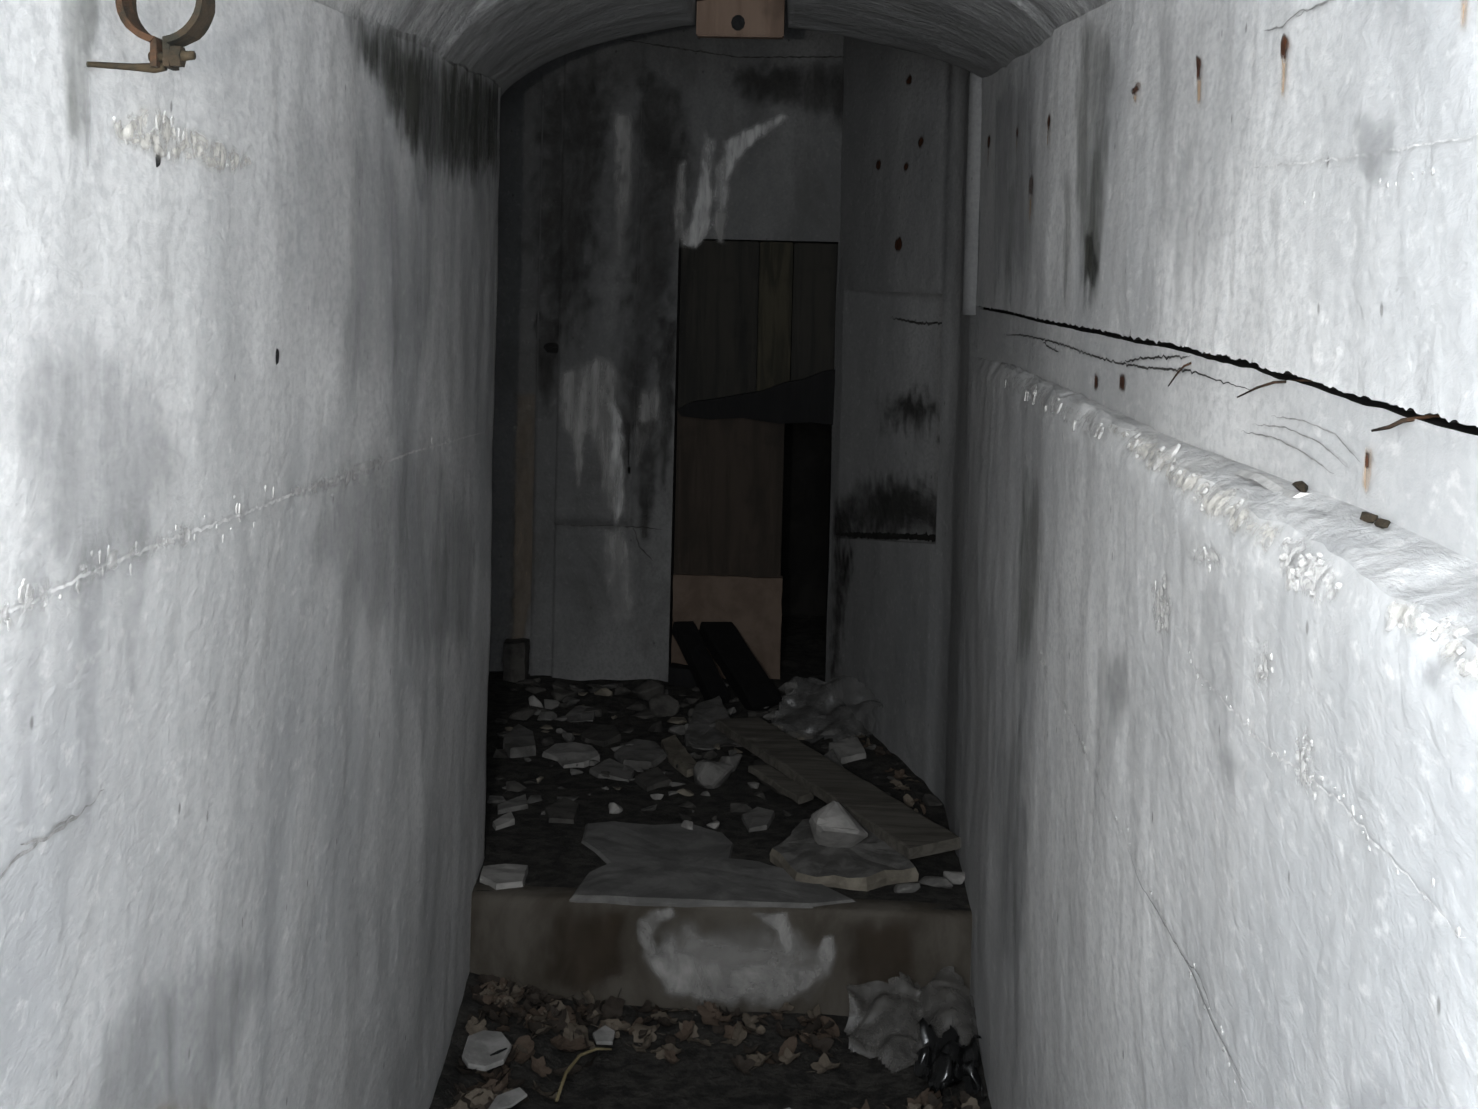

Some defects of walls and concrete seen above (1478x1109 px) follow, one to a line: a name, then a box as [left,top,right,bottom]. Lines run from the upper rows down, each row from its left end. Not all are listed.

crack [1265,0,1331,31]
damp [362,29,498,172]
damp [543,83,632,304]
damp [676,70,844,246]
damp [1084,235,1097,284]
crack [979,306,1478,474]
damp [540,357,673,620]
crack [0,790,103,880]